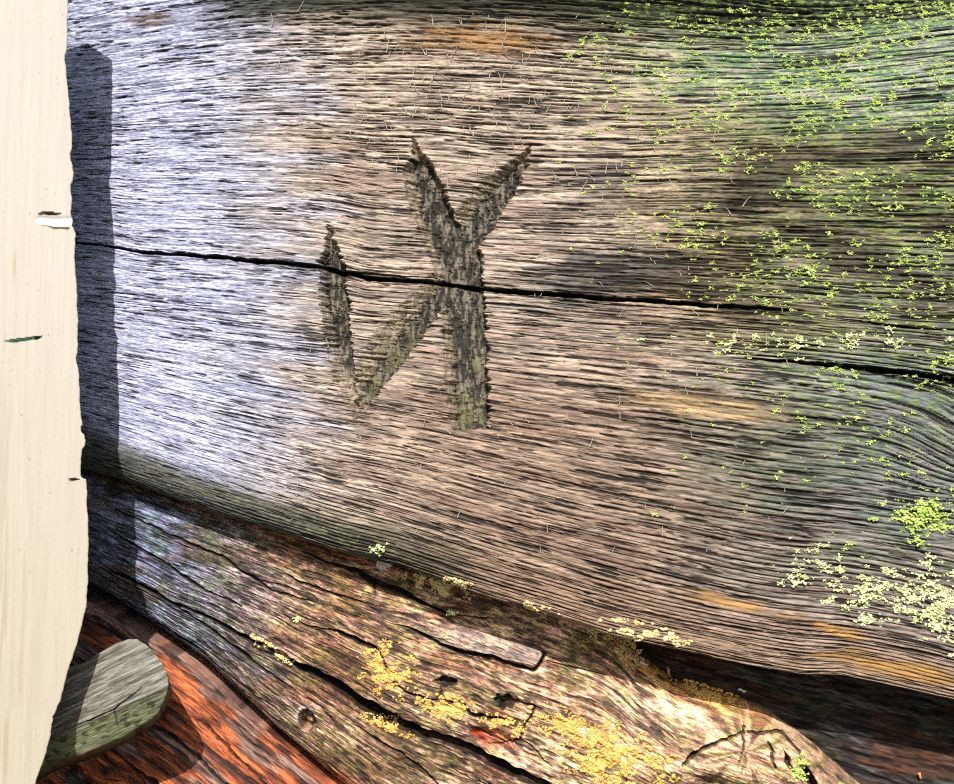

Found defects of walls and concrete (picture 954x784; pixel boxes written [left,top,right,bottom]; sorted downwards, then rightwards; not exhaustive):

crack [75,242,806,312]
crack [835,317,954,331]
crack [744,357,954,388]
crack [109,508,606,784]
crack [66,686,159,784]
crack [681,724,818,784]